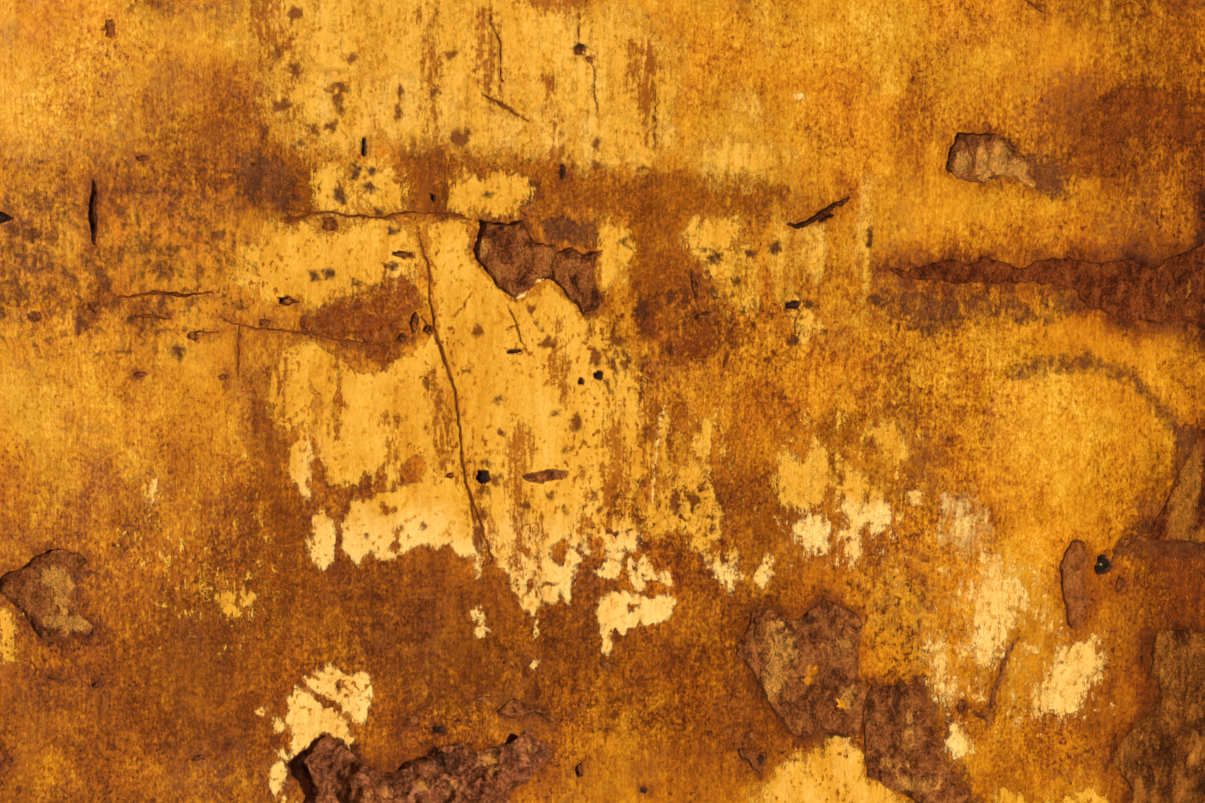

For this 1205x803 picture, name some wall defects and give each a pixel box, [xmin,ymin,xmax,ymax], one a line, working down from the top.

spalling [939,125,1039,196]
crack [110,284,394,385]
crack [276,141,498,569]
peeling [222,0,800,676]
crack [505,303,528,353]
spalling [682,180,1205,345]
corrosion [866,284,1084,338]
spalling [0,543,100,669]
peeling [116,447,282,655]
peeling [770,382,926,586]
spalling [730,431,1205,803]
spalling [254,662,590,803]